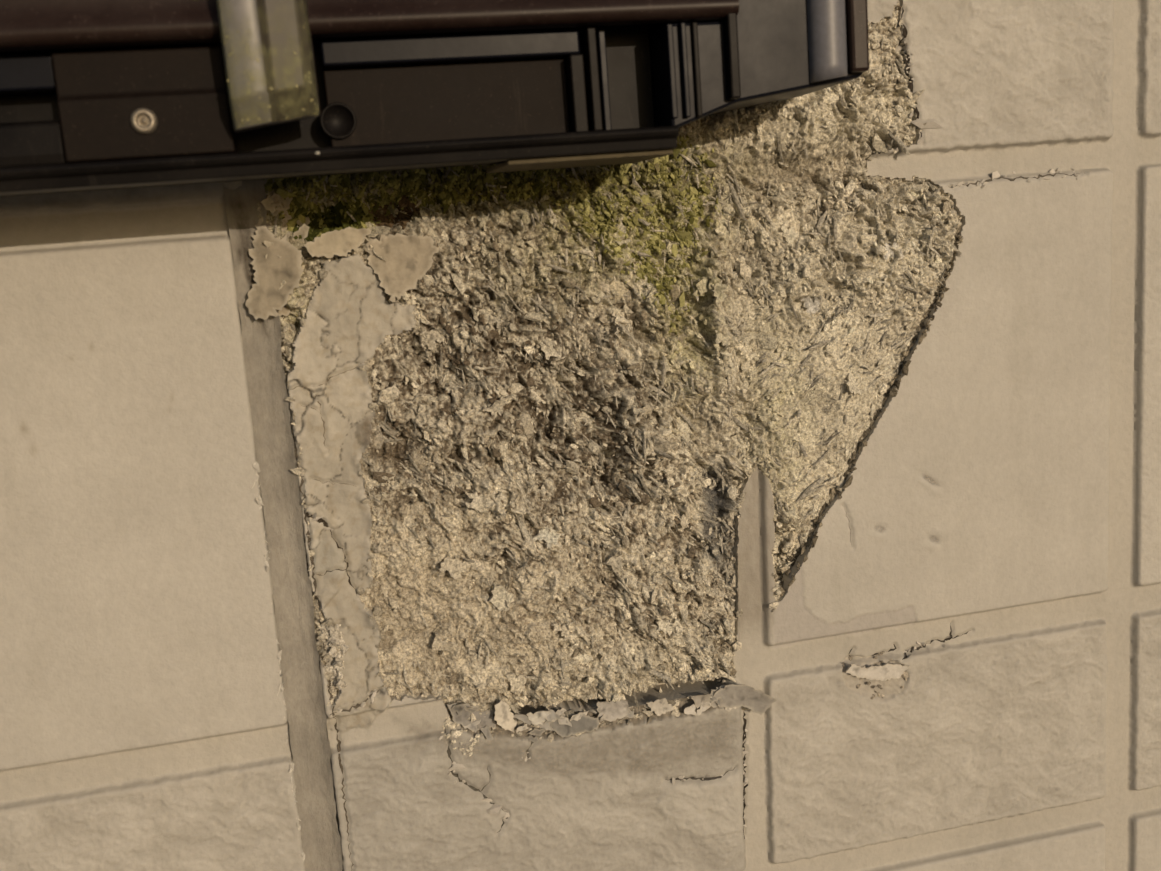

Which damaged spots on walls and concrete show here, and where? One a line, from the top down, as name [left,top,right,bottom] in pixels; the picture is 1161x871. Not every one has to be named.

crack [950,168,1079,188]
crack [290,362,364,651]
spalling [246,1,963,757]
crack [328,680,380,869]